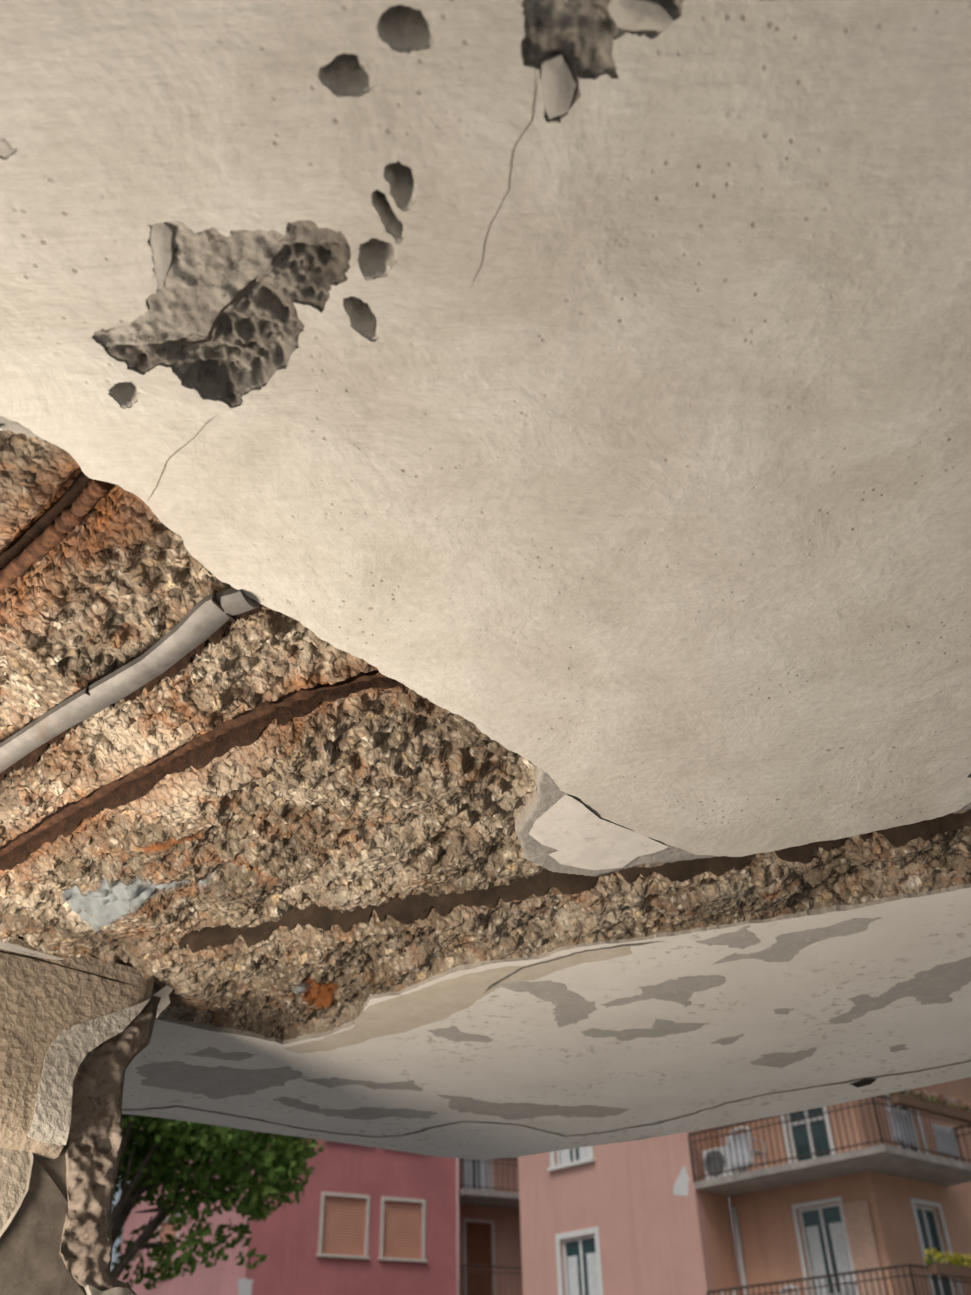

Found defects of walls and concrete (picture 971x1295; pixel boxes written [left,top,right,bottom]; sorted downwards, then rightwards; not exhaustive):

flaking render [318,53,374,97]
flaking render [376,5,435,53]
flaking render [521,0,684,123]
peeling [0,138,18,159]
crack [473,72,536,282]
flaking render [92,161,417,409]
spalling [0,416,971,1295]
rust [302,979,338,1010]